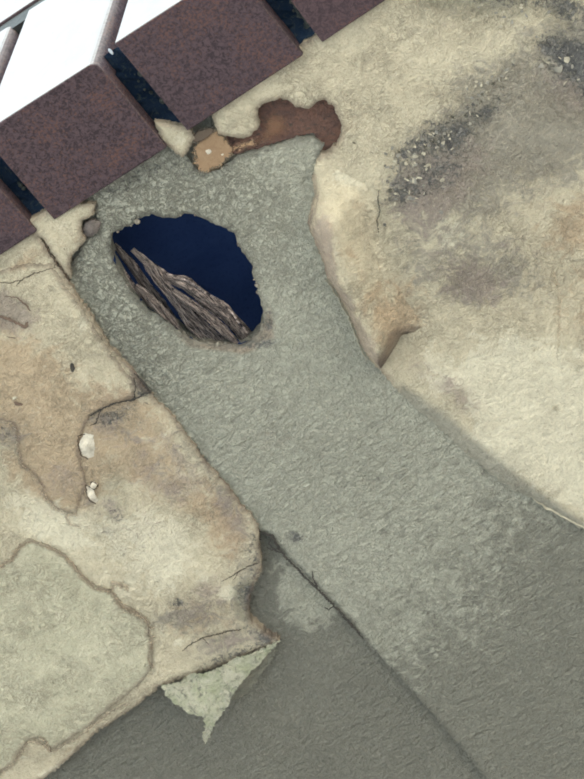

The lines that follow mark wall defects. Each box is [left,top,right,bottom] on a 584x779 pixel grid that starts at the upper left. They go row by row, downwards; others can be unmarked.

peeling [538,49,578,73]
corrosion [192,118,284,172]
spalling [69,98,584,779]
crack [182,629,241,651]